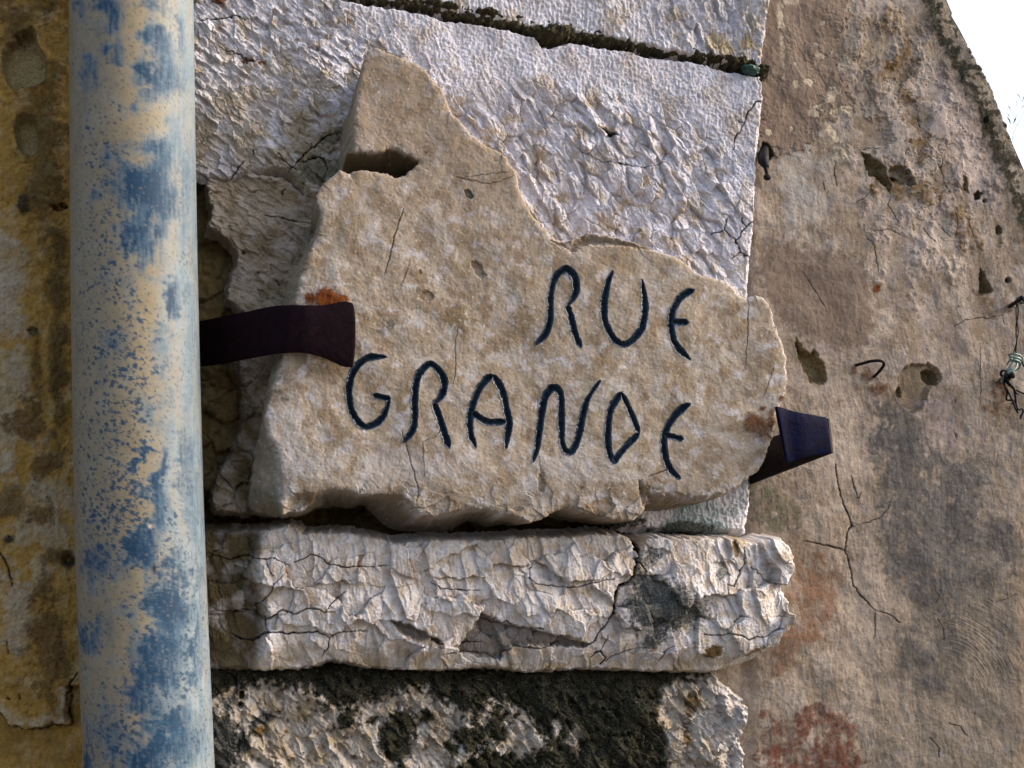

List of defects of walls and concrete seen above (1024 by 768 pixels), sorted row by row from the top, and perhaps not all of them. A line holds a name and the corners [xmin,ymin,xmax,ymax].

peeling [758,0,911,193]
leakage [0,81,68,441]
crack [713,218,753,260]
peeling [757,239,874,385]
spalling [977,269,992,296]
leakage [0,484,55,525]
leakage [30,453,61,481]
leakage [20,548,72,715]
crack [529,540,644,664]
crack [806,472,894,618]
spalling [894,362,965,454]
spalling [11,694,74,730]